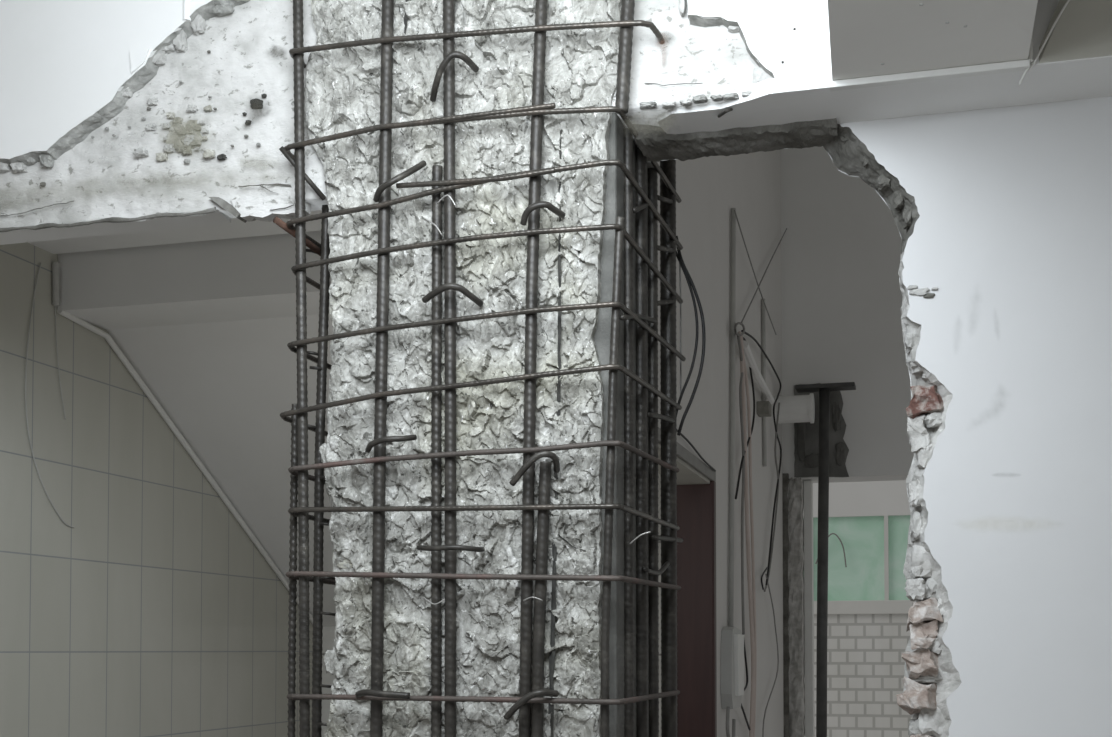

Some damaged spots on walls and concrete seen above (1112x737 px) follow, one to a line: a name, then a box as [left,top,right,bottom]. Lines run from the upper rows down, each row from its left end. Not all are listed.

spalling [0,0,250,174]
spalling [217,93,267,161]
spalling [304,0,621,737]